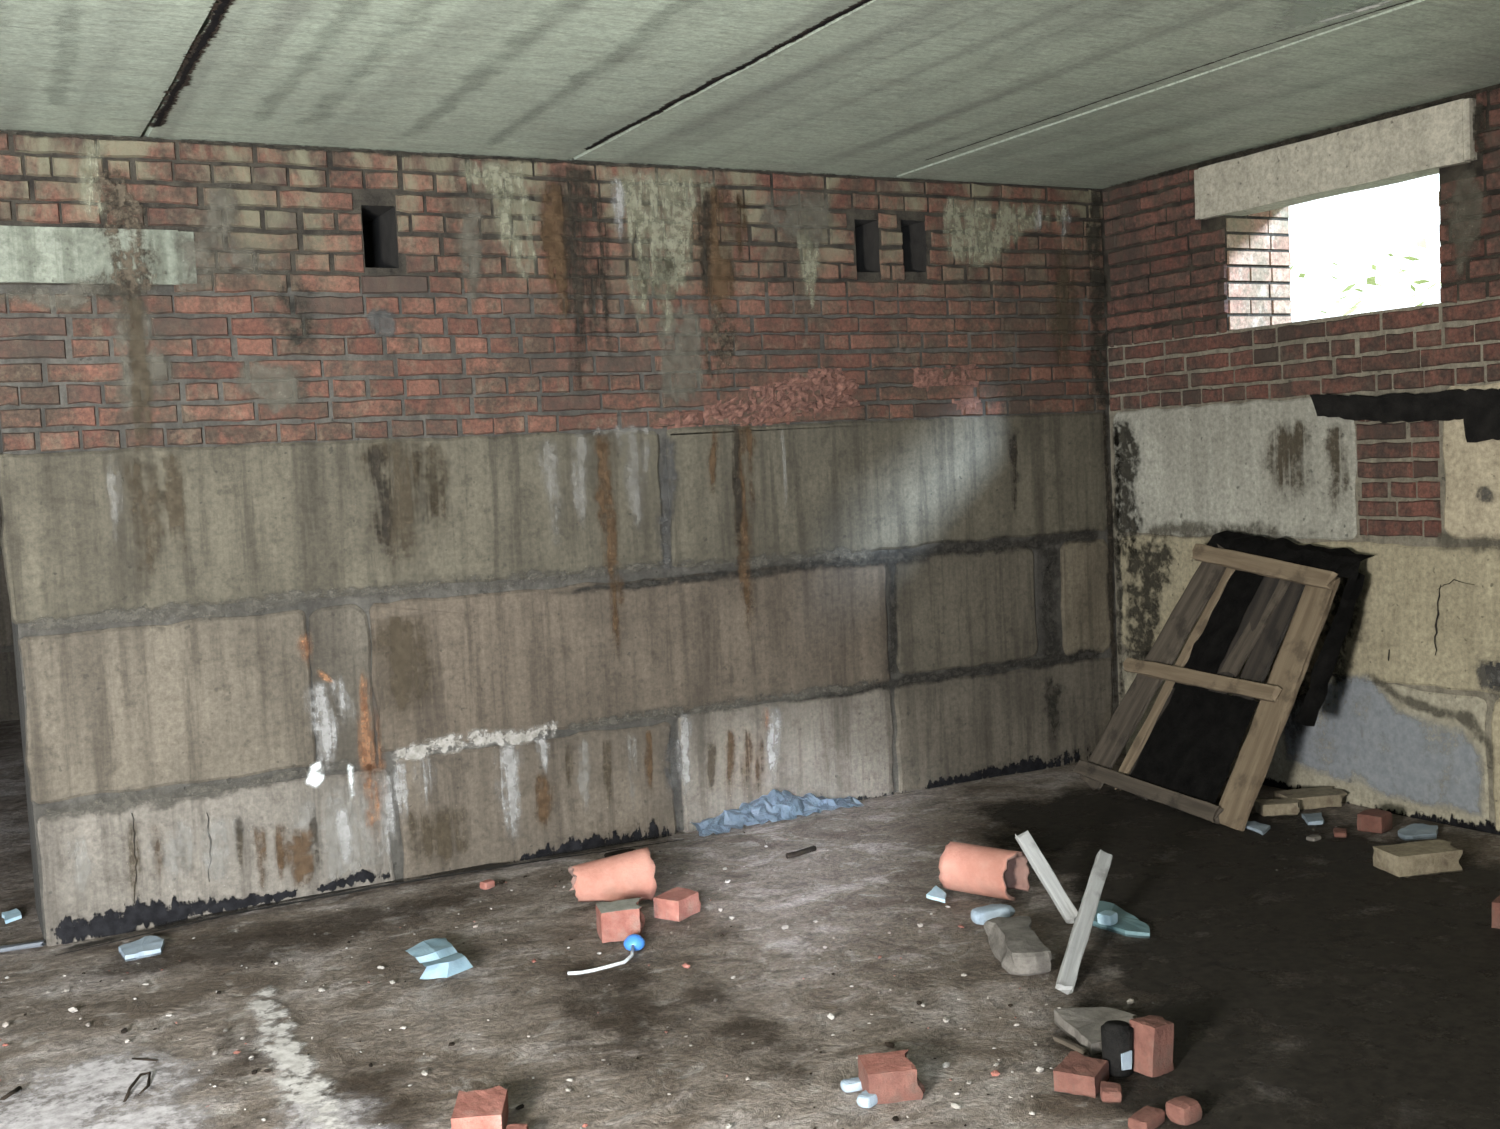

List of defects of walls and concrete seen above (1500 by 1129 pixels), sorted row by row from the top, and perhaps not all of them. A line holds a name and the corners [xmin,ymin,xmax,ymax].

water stain [926,0,1413,160]
water stain [0,0,872,438]
water stain [574,88,1500,737]
water stain [125,454,185,569]
water stain [362,443,447,558]
rust [595,434,622,645]
water stain [373,617,430,710]
rust [307,672,382,825]